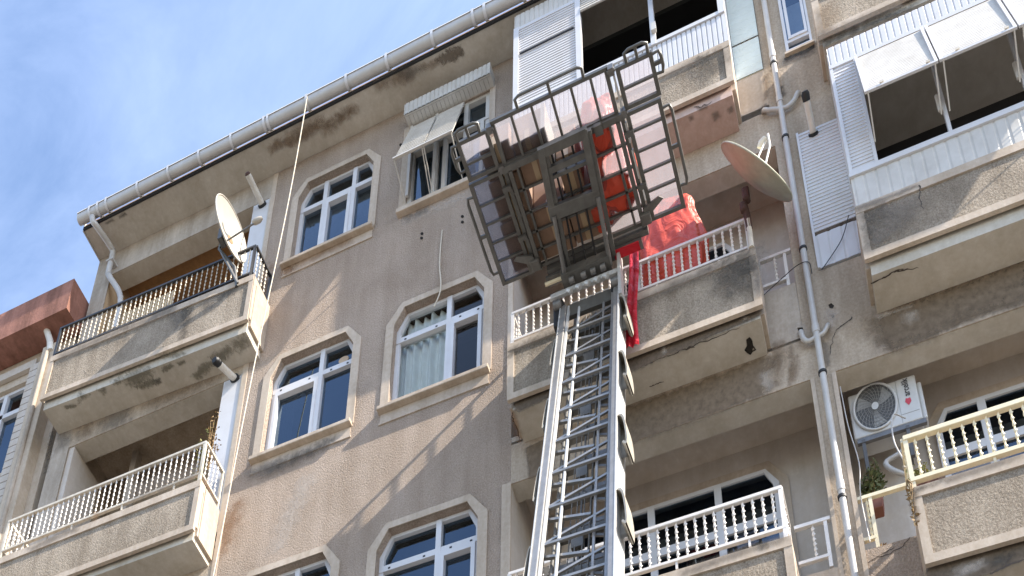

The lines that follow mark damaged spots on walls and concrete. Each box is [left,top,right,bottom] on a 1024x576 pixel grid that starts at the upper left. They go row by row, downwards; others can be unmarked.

crack [871,267,918,284]
crack [650,328,739,387]
spalling [627,309,763,373]
spalling [513,389,550,411]